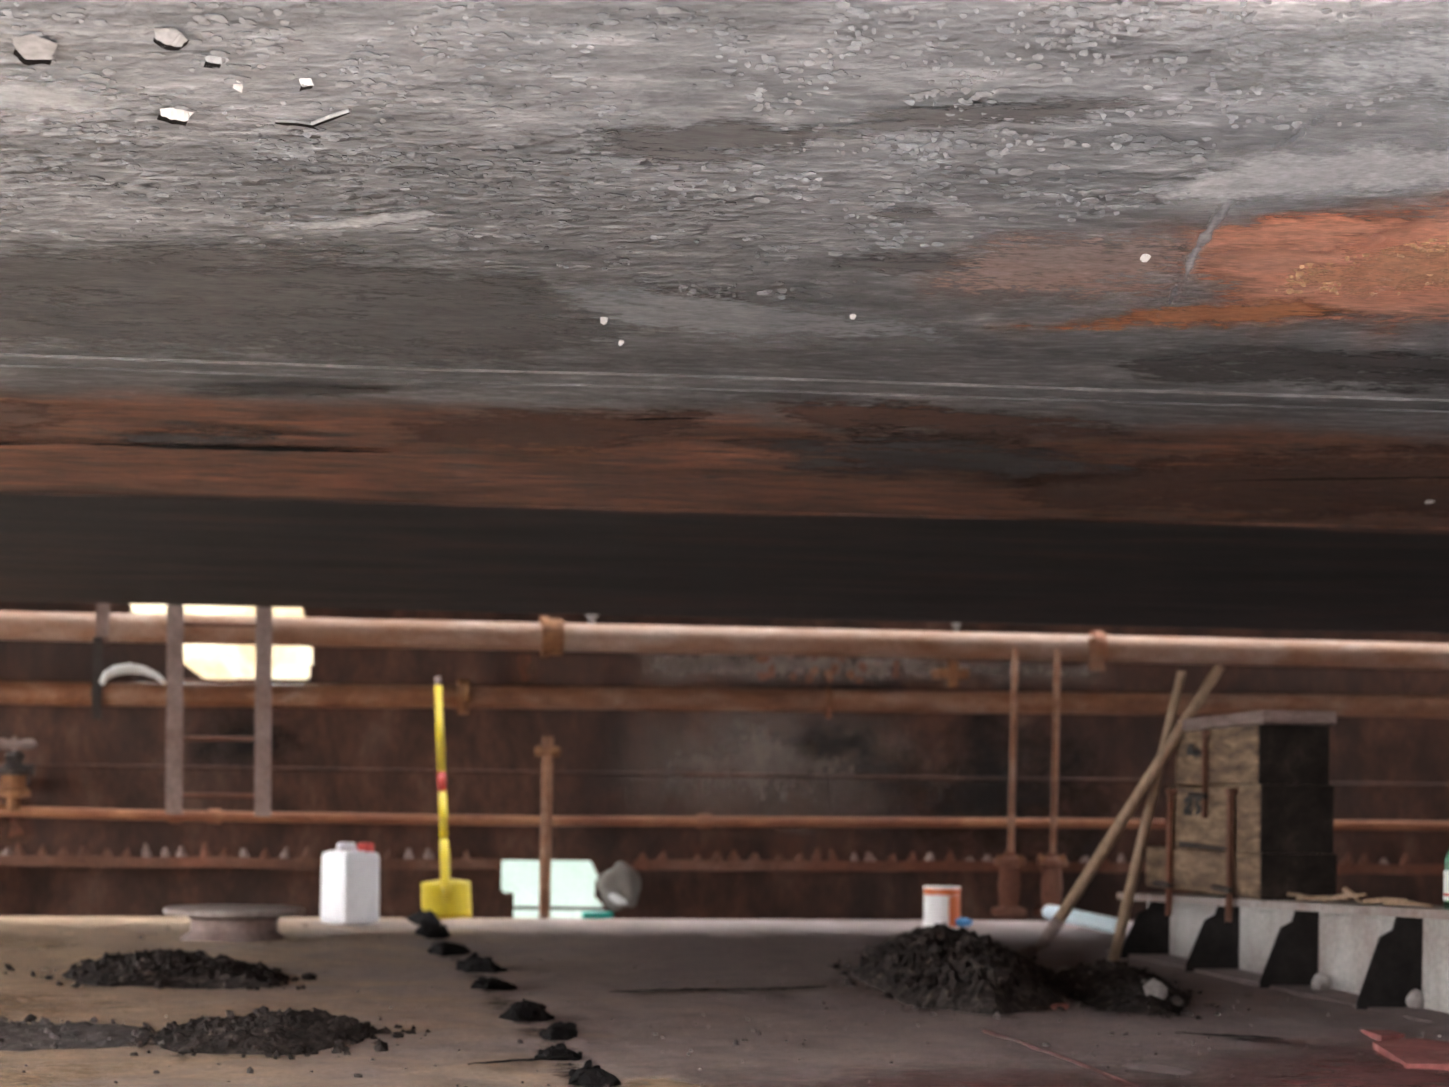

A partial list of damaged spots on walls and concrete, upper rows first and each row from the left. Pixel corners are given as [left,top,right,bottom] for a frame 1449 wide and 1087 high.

peeling [0,0,1449,300]
water stain [596,96,1149,165]
rust [923,205,1449,331]